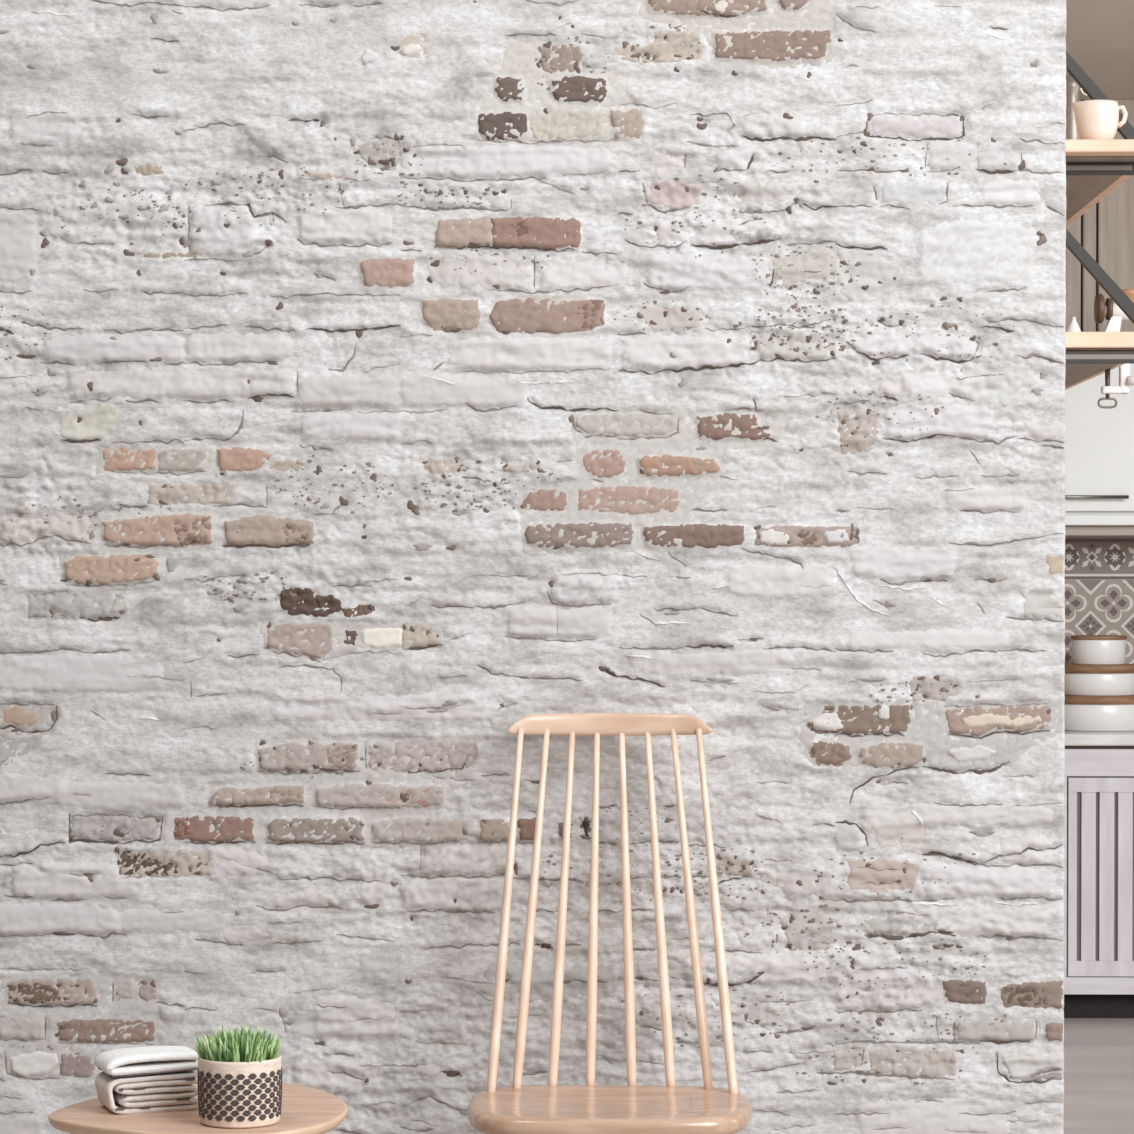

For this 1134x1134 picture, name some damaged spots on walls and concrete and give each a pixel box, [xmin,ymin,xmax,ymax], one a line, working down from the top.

spalling [325,131,581,288]
spalling [422,284,711,334]
peeling [407,410,860,555]
spalling [203,571,443,663]
peeling [797,675,1063,775]
peeling [70,736,536,878]